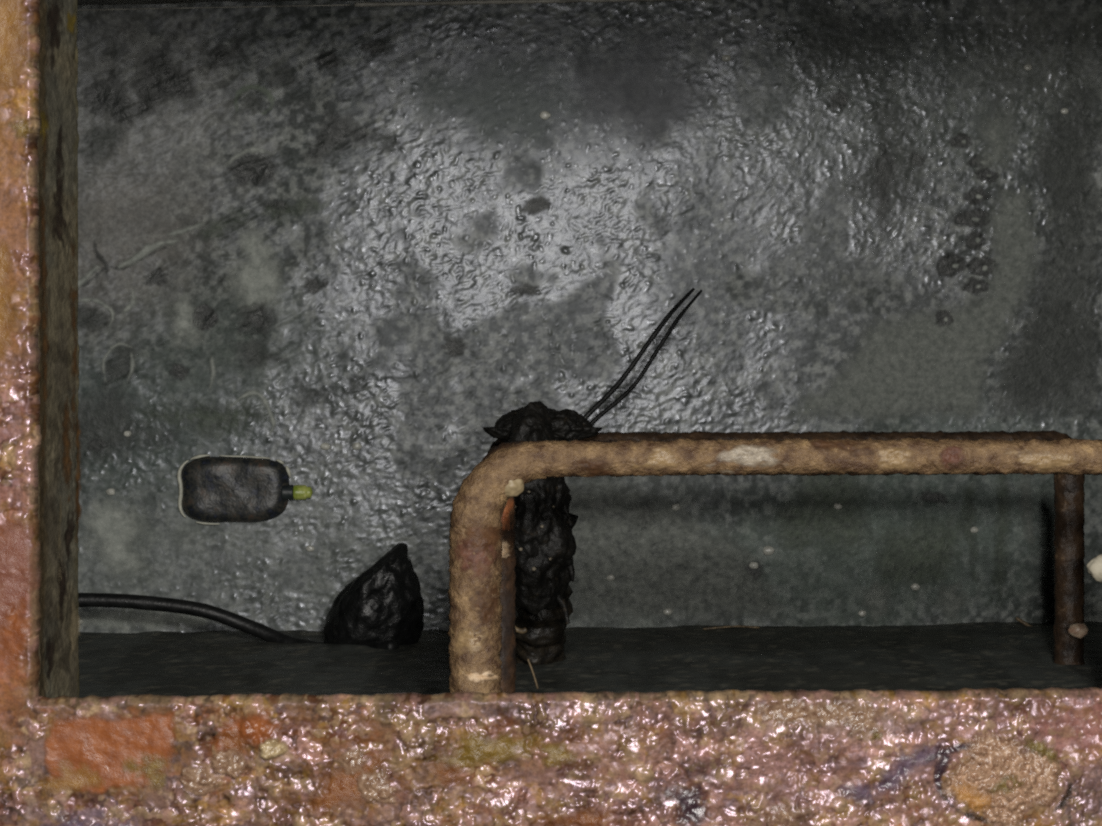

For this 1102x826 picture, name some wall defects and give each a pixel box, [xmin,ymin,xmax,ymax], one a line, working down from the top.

leakage [82,48,192,160]
leakage [229,148,274,184]
leakage [210,217,280,332]
leakage [795,93,1102,417]
leakage [175,298,197,343]
leakage [89,502,142,573]
leakage [80,609,206,629]
rust [40,713,175,793]